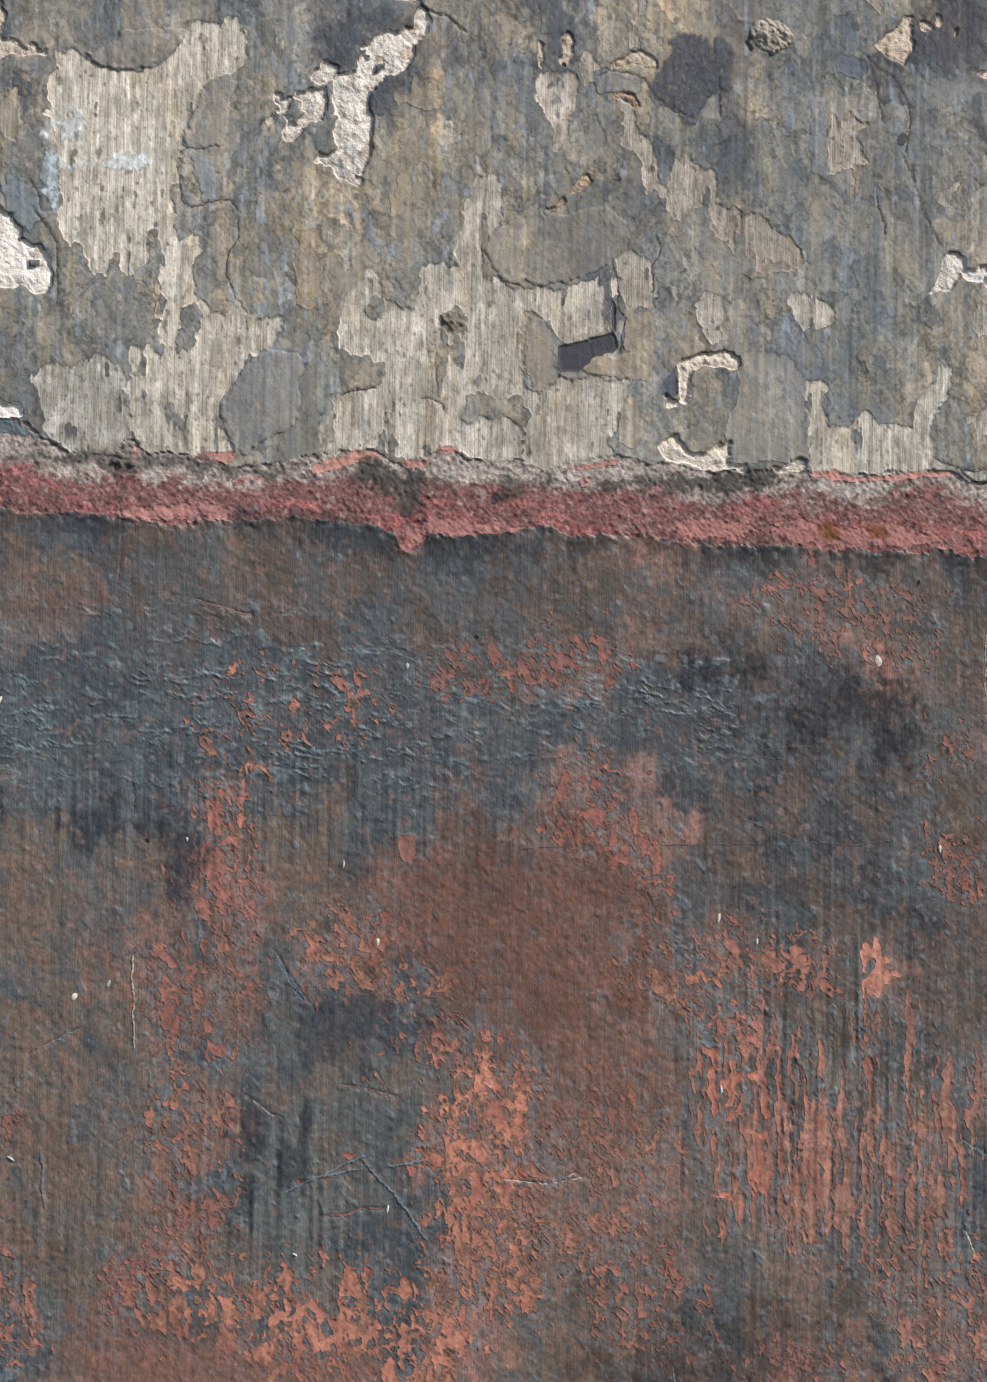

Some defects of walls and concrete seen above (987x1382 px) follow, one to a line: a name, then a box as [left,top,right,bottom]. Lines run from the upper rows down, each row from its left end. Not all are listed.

peeling [0,0,307,465]
flaking render [266,0,432,187]
peeling [534,0,657,152]
peeling [612,92,804,272]
peeling [809,109,870,179]
flaking render [835,14,957,80]
peeling [312,171,659,487]
flaking render [662,292,740,409]
peeling [787,292,836,331]
flaking render [930,252,987,337]
flaking render [658,435,748,473]
peeling [772,364,987,482]